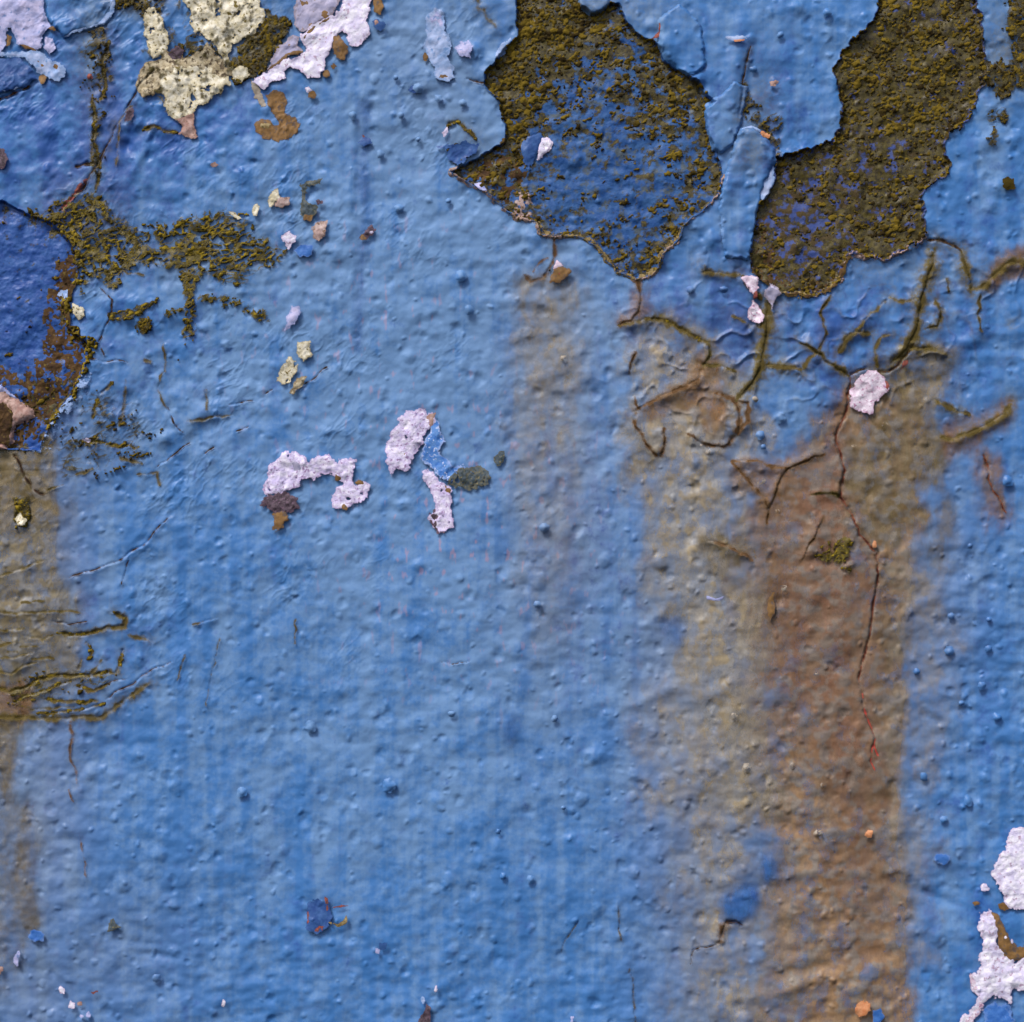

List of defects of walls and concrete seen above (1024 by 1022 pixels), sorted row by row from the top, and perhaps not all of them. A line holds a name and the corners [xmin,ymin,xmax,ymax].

peeling [61,178,87,211]
peeling [135,0,386,139]
peeling [448,0,996,323]
peeling [1002,177,1016,190]
peeling [0,199,99,455]
peeling [447,451,505,491]
crack [618,239,1024,771]
crack [0,600,186,802]
rust [699,344,953,1022]
peeling [960,827,1024,1022]